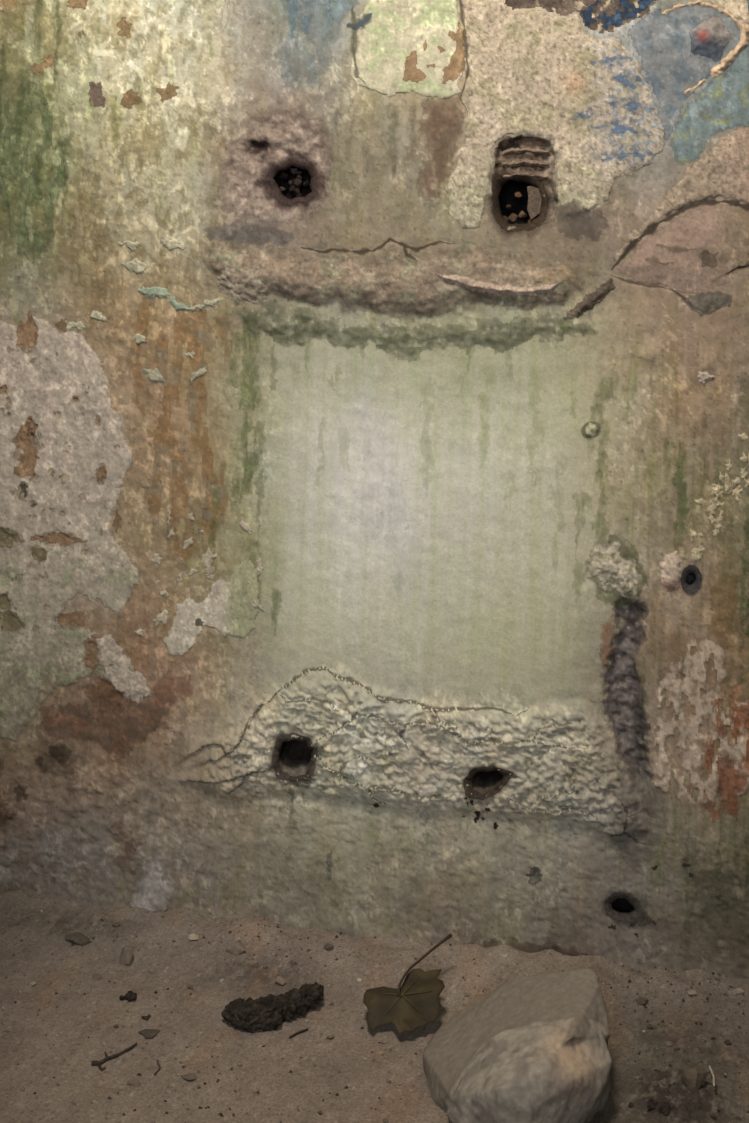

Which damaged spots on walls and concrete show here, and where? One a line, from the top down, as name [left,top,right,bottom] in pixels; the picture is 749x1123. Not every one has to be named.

spalling [700,0,749,24]
spalling [347,0,665,234]
crack [301,238,453,261]
crack [611,199,749,314]
water stain [237,304,589,407]
water stain [241,422,257,490]
peeling [0,310,152,742]
peeling [134,505,264,656]
water stain [600,536,646,608]
crack [192,666,585,805]
rust [702,698,749,821]
crack [504,791,656,846]